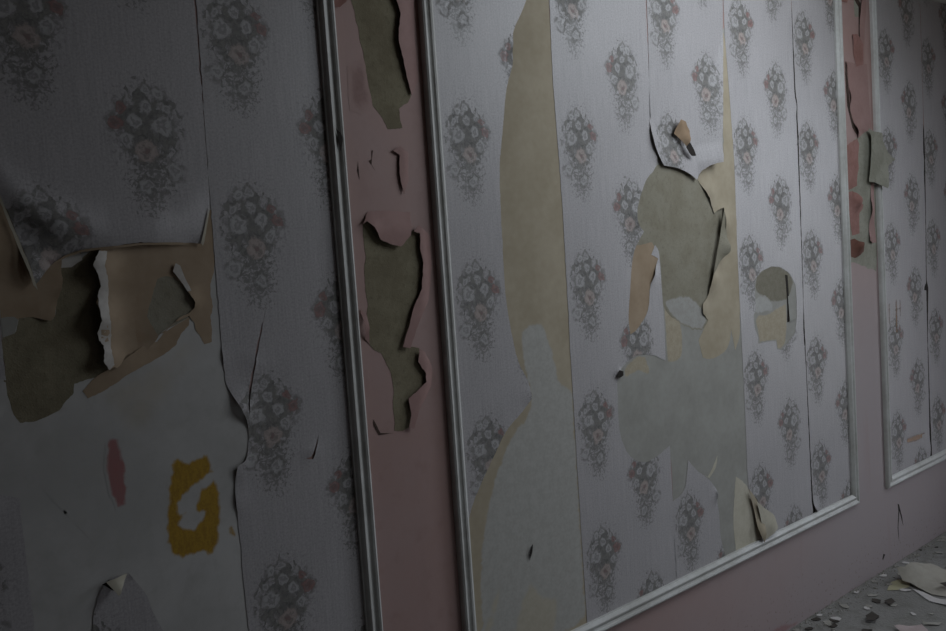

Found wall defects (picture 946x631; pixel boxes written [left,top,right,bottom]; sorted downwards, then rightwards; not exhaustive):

peeling [334,0,419,129]
peeling [842,0,896,271]
flaking render [2,250,108,423]
flaking render [147,276,195,336]
peeling [360,211,432,435]
flaking render [637,164,726,330]
flaking render [755,266,794,304]